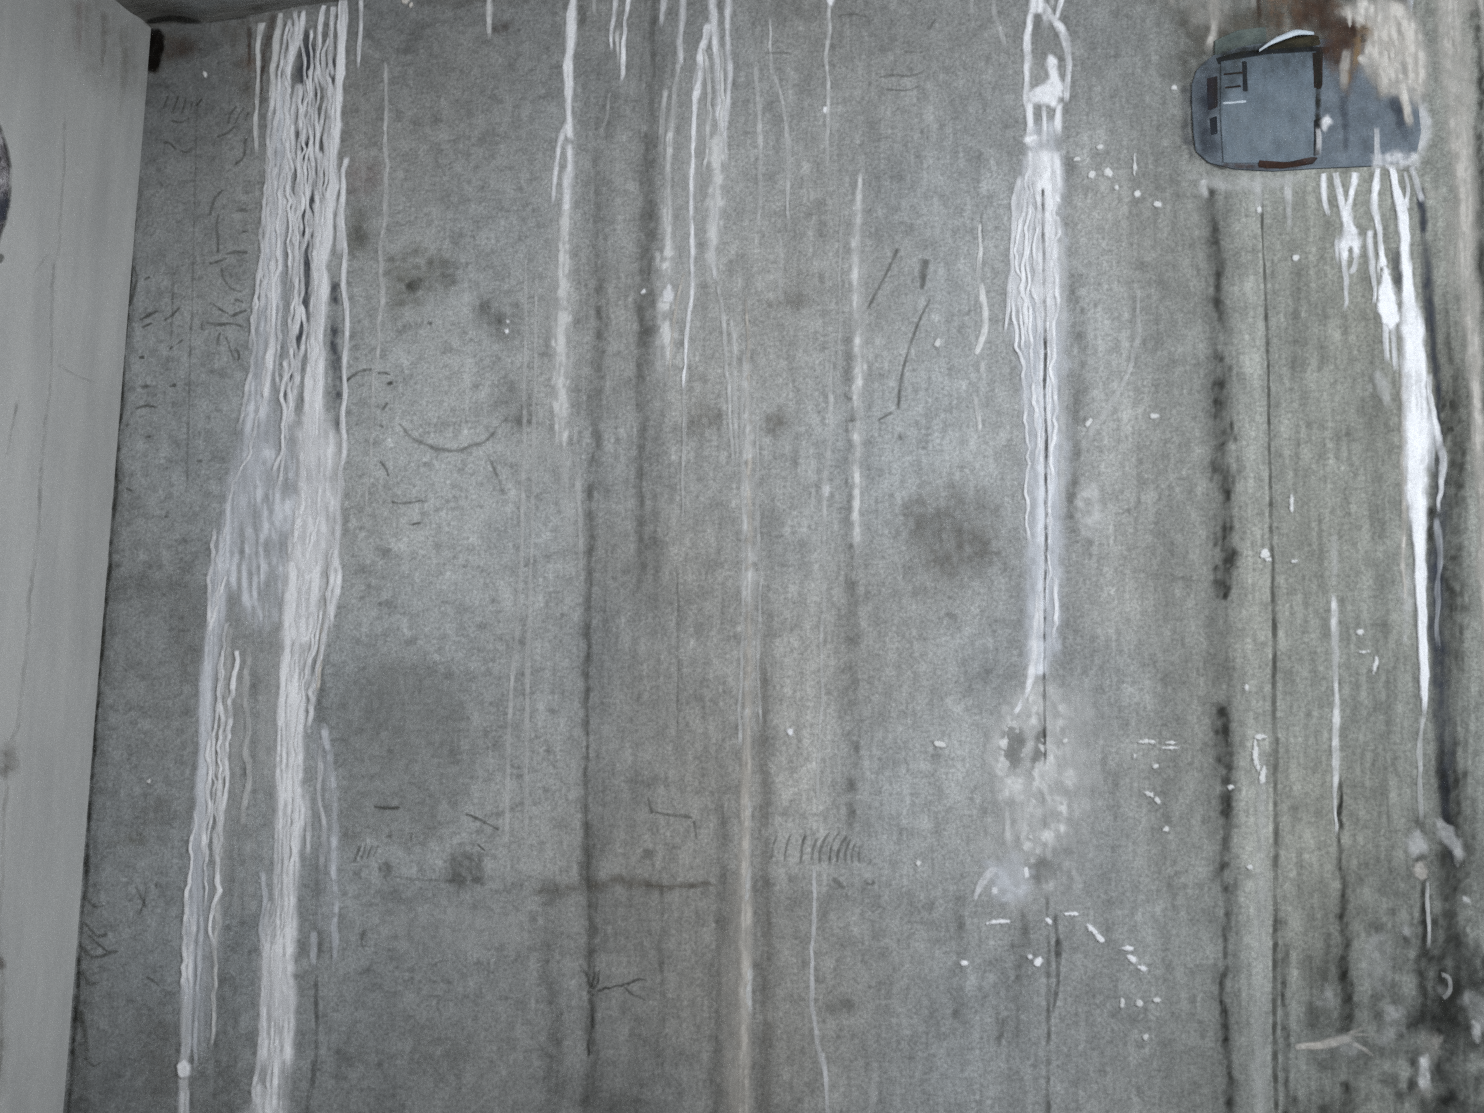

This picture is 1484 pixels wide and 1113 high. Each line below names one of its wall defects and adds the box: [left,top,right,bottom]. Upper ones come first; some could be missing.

leakage [176,0,363,1113]
efflorescence [523,0,594,447]
efflorescence [609,0,631,80]
leakage [655,0,762,1113]
efflorescence [974,0,1089,901]
efflorescence [1077,484,1101,527]
leakage [1331,596,1343,842]
rust [1322,20,1358,81]
leakage [1321,0,1484,785]
leakage [1422,890,1456,1011]